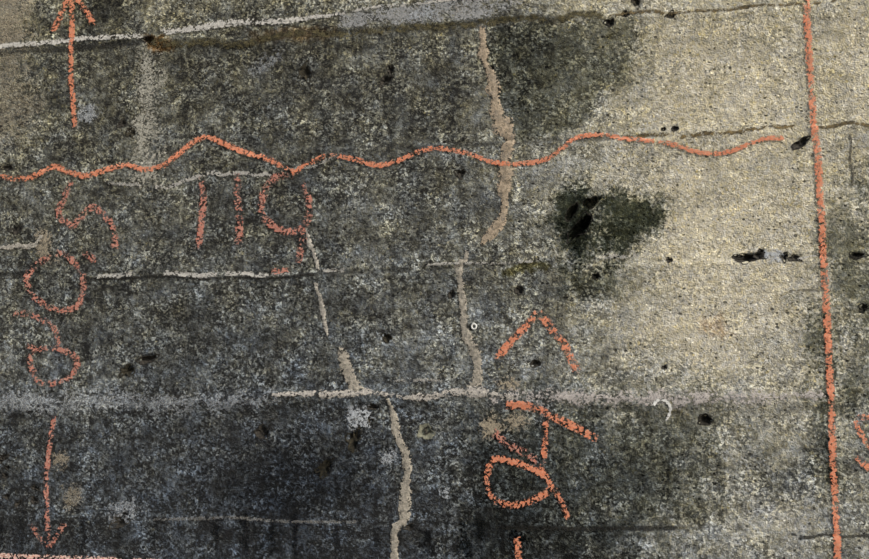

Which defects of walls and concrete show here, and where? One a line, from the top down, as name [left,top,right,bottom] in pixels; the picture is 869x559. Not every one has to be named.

crack [0,0,837,397]
leakage [545,184,667,269]
crack [386,398,412,559]
leakage [272,376,825,439]